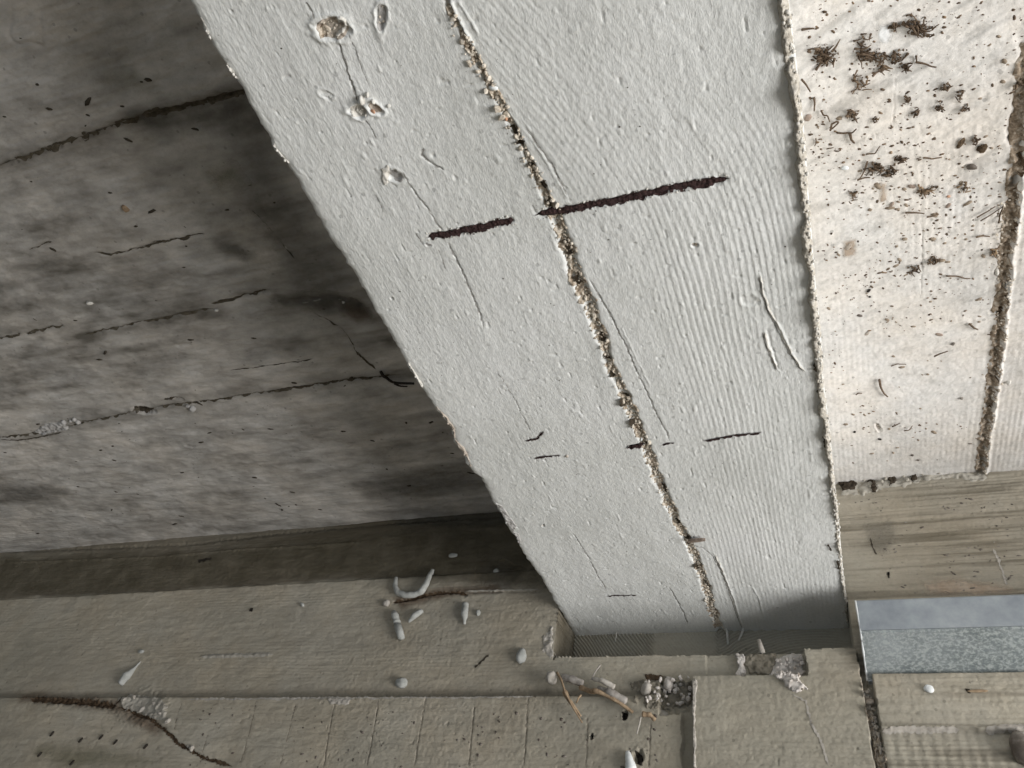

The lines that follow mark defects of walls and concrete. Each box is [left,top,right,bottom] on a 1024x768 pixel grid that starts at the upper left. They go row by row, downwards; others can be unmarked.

spalling [316,15,349,40]
crack [3,89,245,164]
spalling [350,92,391,117]
crack [527,130,567,195]
rust [426,215,516,241]
rust [535,175,736,220]
crack [0,289,268,339]
crack [2,315,394,441]
crack [589,278,670,441]
crack [694,545,744,629]
crack [30,697,256,766]